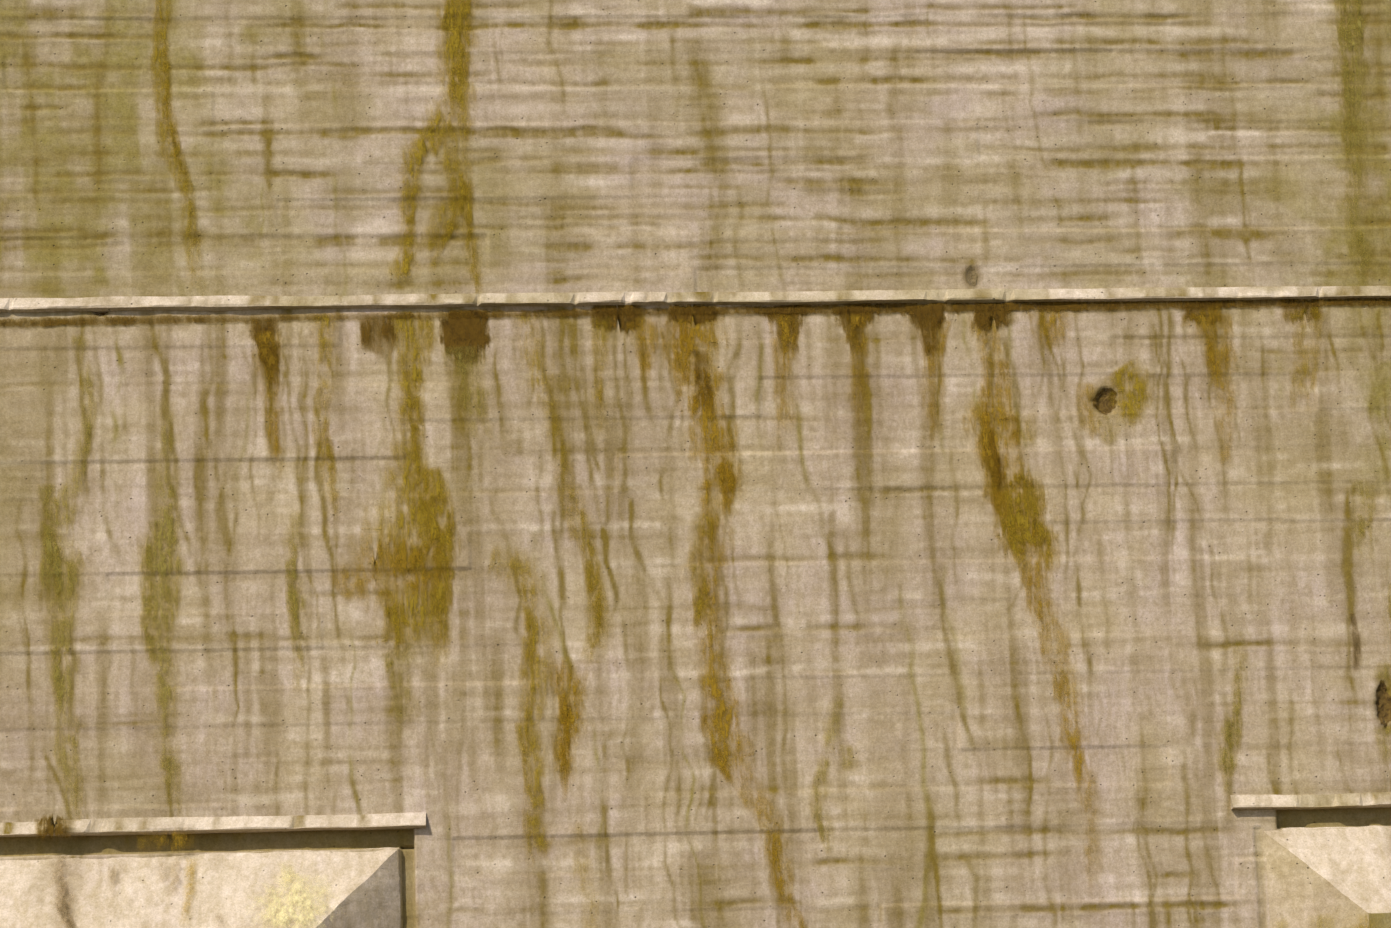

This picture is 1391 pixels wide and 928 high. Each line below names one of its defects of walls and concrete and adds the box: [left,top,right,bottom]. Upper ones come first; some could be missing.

damp [396,0,472,275]
damp [764,305,803,359]
damp [833,304,873,349]
damp [909,303,945,367]